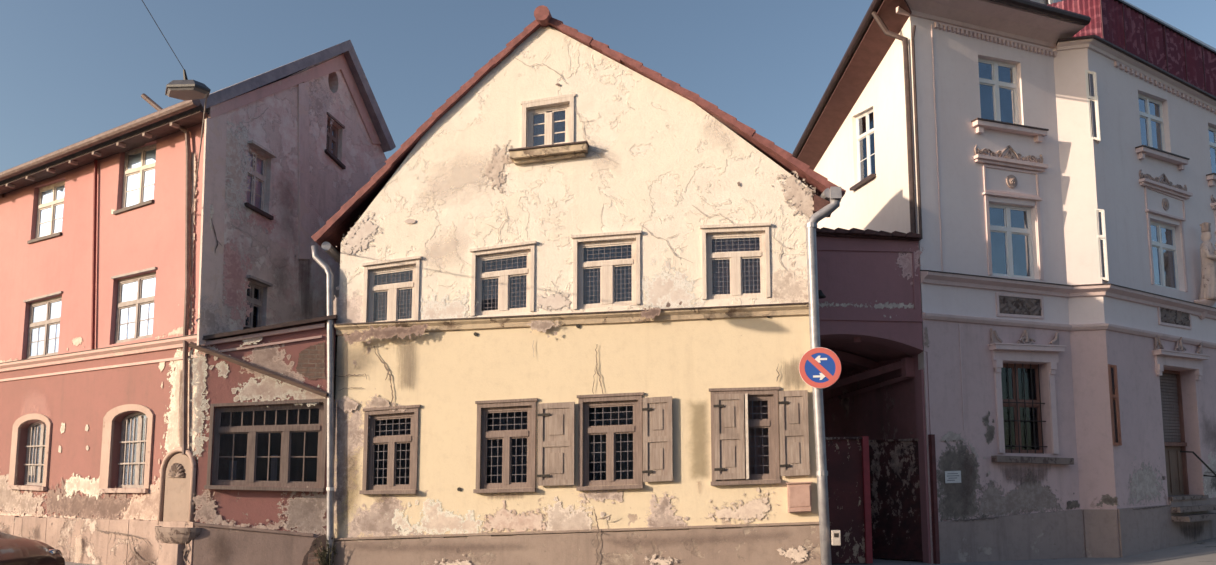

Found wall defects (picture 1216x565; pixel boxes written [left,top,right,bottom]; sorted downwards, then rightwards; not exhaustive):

crack [514,54,619,164]
peeling [771,171,822,226]
crack [641,205,733,269]
flaking render [0,118,406,521]
crack [334,346,394,405]
crack [592,348,603,394]
flaking render [936,411,1080,522]
flaking render [190,486,623,565]
flaking render [644,492,688,531]
flaking render [706,487,779,524]